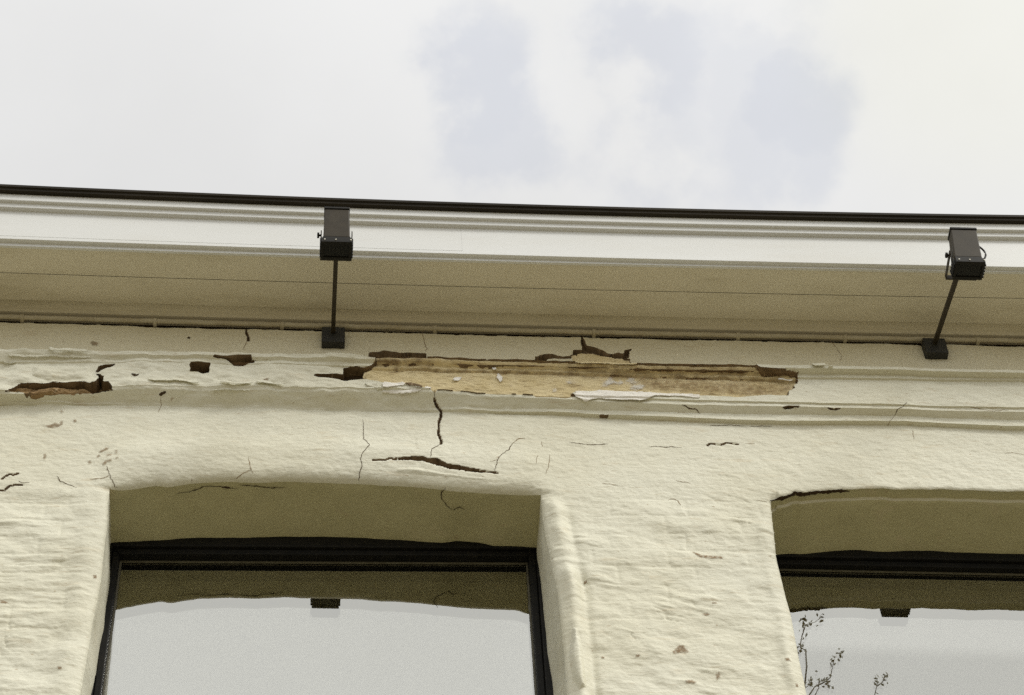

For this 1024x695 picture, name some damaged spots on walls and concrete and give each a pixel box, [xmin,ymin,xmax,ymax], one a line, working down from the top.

spalling [344,343,796,402]
spalling [11,388,102,400]
crack [431,391,442,455]
crack [178,458,276,494]
crack [761,489,850,502]